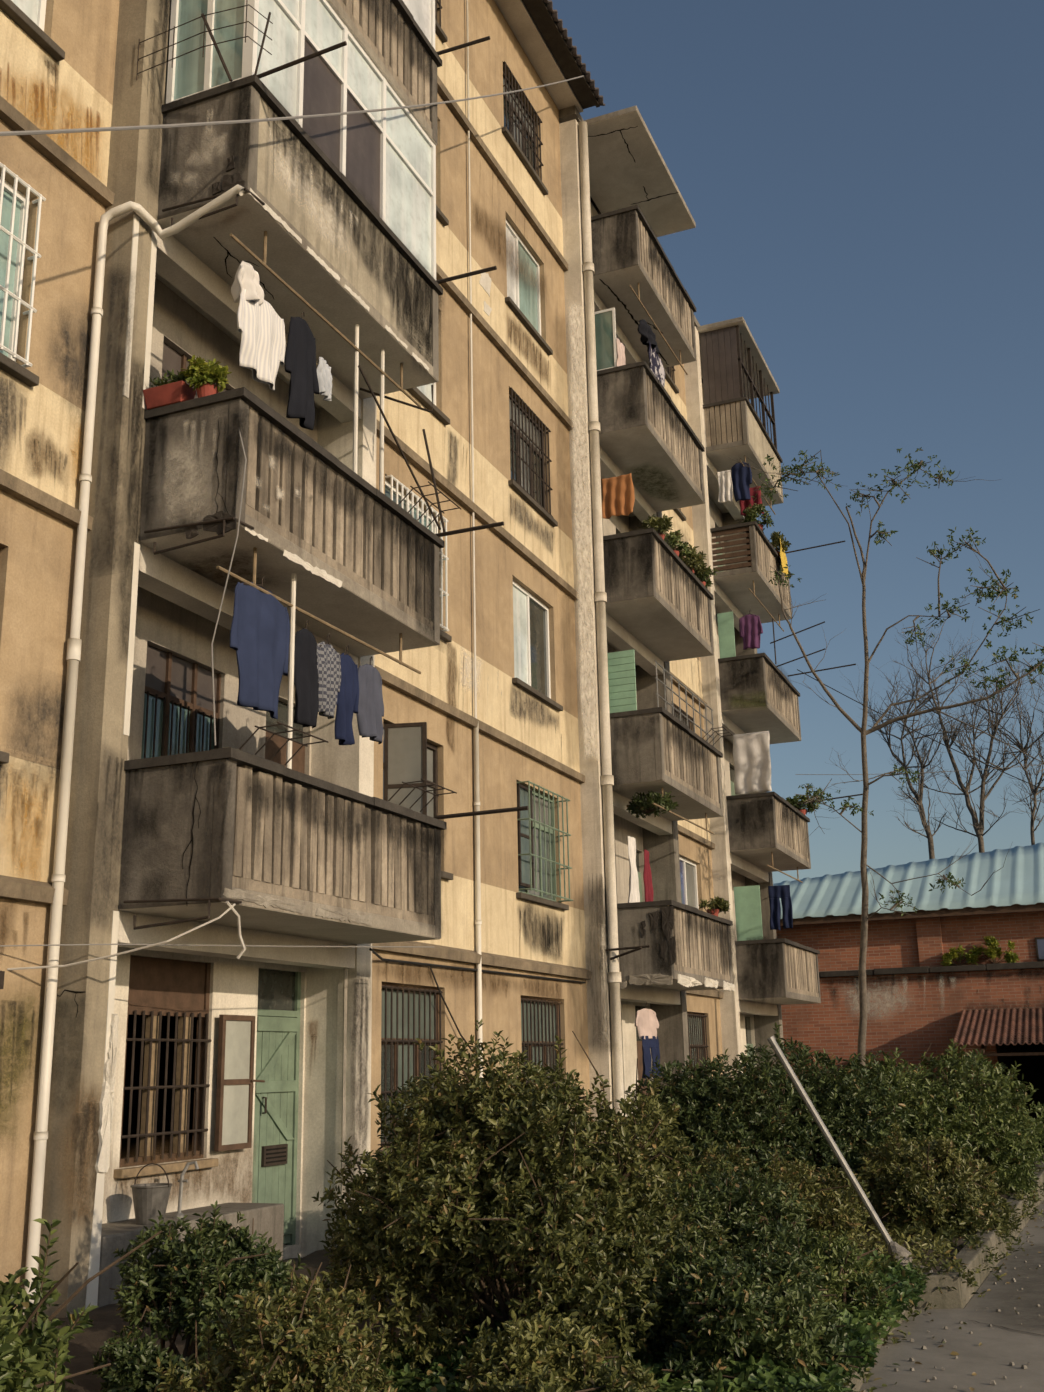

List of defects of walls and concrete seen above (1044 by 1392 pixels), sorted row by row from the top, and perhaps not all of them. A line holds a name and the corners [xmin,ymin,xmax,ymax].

corrosion [0,66,99,172]
water stain [150,154,171,197]
water stain [193,89,250,166]
crack [588,126,679,205]
water stain [272,114,441,372]
water stain [29,439,60,474]
water stain [188,555,266,586]
water stain [215,409,479,747]
water stain [95,758,154,917]
water stain [202,762,233,898]
water stain [250,778,442,926]
water stain [520,904,562,956]